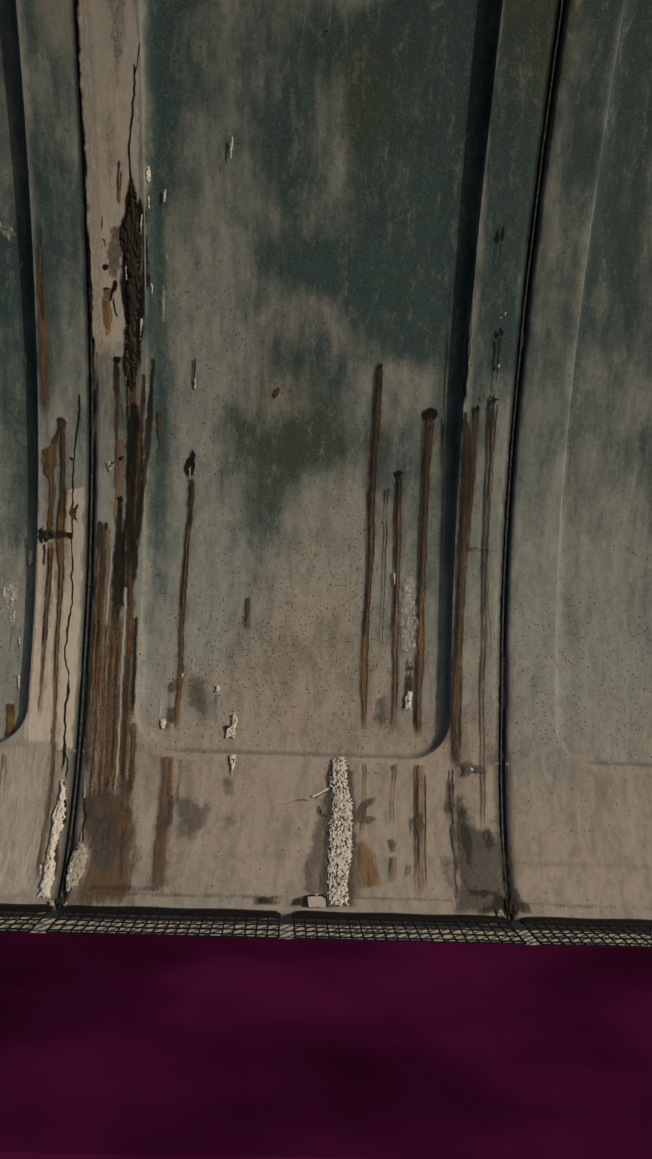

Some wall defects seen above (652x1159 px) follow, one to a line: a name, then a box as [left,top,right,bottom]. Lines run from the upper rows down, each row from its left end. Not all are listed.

corrosion [25,230,50,407]
peeling [78,0,166,606]
corrosion [5,703,15,736]
corrosion [37,417,68,872]
corrosion [84,356,138,799]
corrosion [153,757,174,890]
corrosion [167,479,195,729]
corrosion [362,364,404,725]
corrosion [357,764,427,890]
corrosion [415,408,438,731]
corrosion [452,330,499,821]